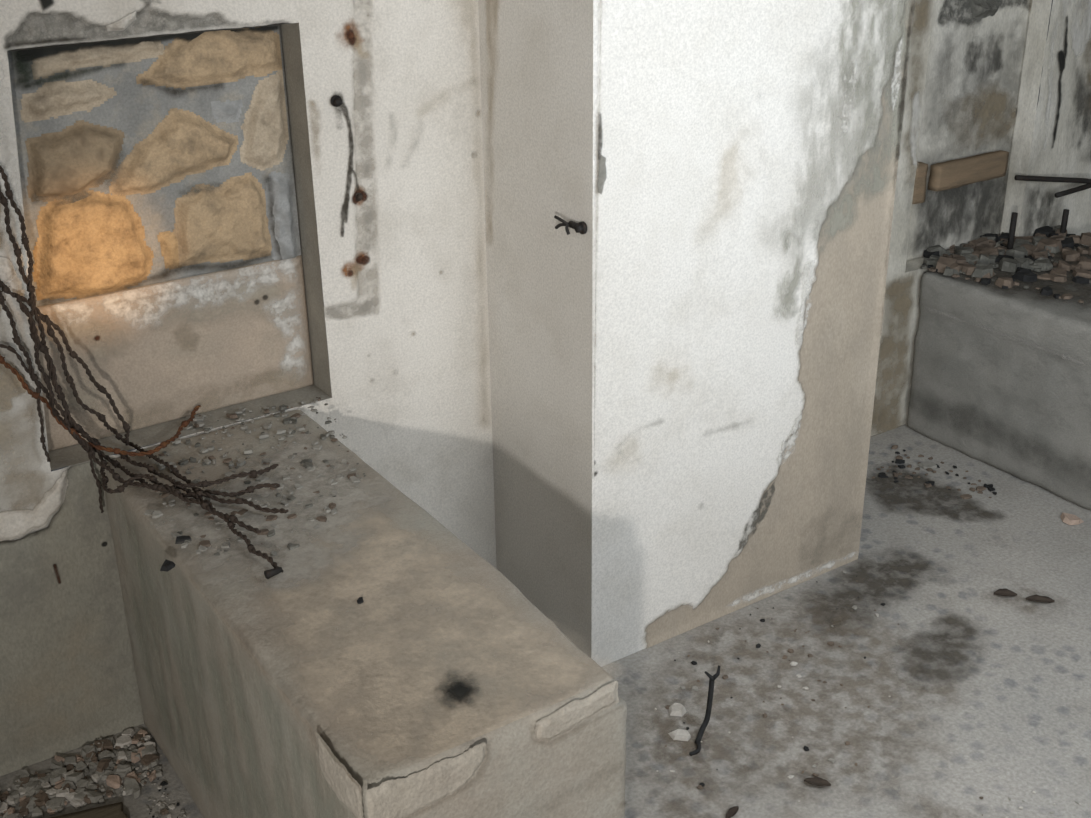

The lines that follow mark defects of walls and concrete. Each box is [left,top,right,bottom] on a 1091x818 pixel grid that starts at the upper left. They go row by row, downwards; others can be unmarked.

corrosion [344,23,361,45]
water stain [1075,72,1091,145]
water stain [1026,190,1054,235]
corrosion [343,253,370,276]
water stain [645,0,930,648]
spalling [0,458,144,776]
spalling [439,675,475,708]
spalling [534,681,619,743]
spalling [316,732,488,818]